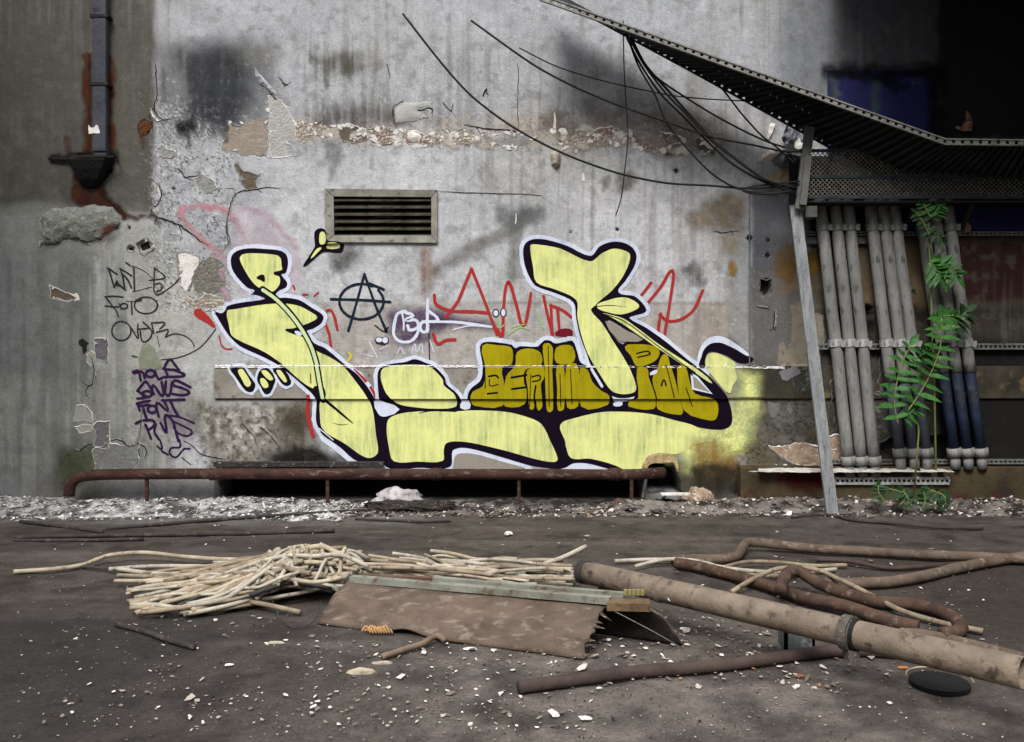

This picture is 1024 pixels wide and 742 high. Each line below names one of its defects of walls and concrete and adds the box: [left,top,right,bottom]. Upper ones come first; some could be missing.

rust [82,54,91,153]
crack [149,61,171,122]
crack [260,76,290,100]
flaking render [221,96,537,192]
flaking render [555,124,722,174]
crack [151,167,281,251]
flaking render [49,285,80,303]
spalling [758,278,773,297]
peeling [78,337,109,366]
peeling [73,404,141,470]
spalling [641,453,679,472]
flaking render [748,353,954,473]